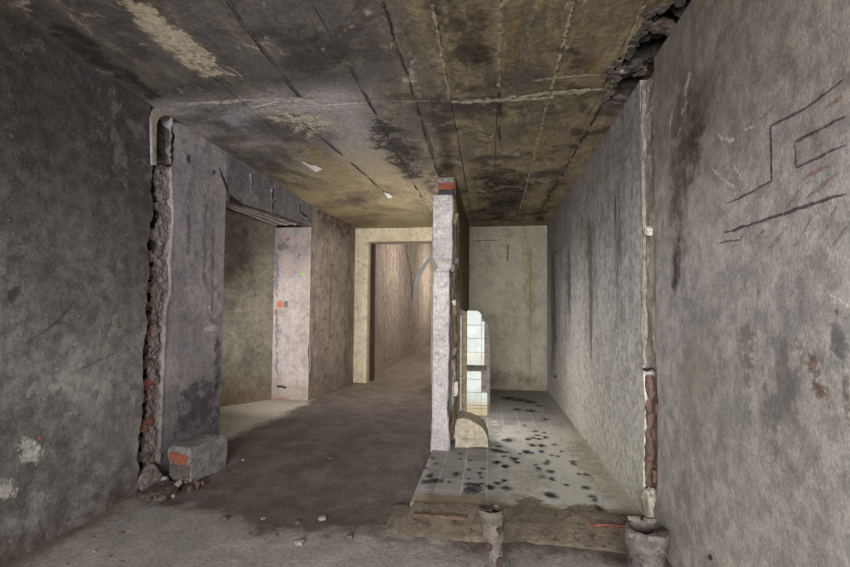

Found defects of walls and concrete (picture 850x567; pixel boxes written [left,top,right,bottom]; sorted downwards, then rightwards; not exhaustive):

crack [226,0,300,98]
crack [300,120,386,193]
crack [349,68,422,198]
crack [381,0,440,177]
crack [495,92,503,140]
water stain [431,2,647,211]
crack [542,102,603,208]
spalling [600,0,691,109]
spalling [137,119,180,472]
spalling [644,374,658,493]